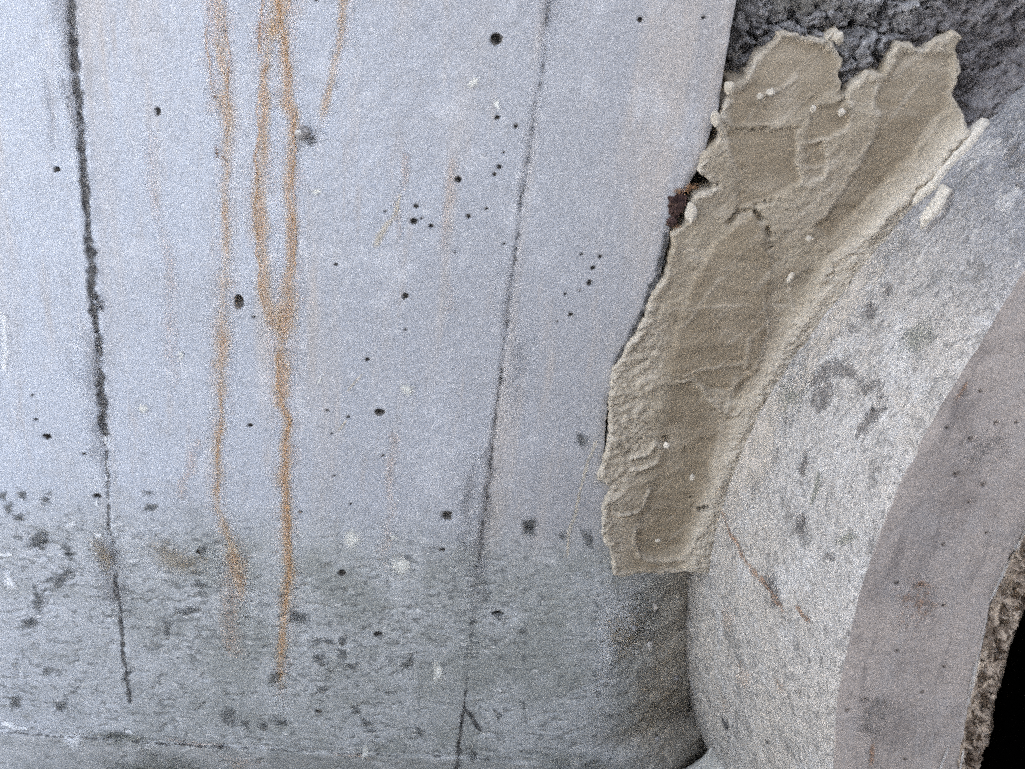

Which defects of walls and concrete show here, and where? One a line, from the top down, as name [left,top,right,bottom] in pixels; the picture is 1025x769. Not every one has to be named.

spalling [724,0,1025,230]
spalling [666,171,698,228]
crack [67,0,132,703]
crack [10,732,229,749]
crack [432,687,482,769]